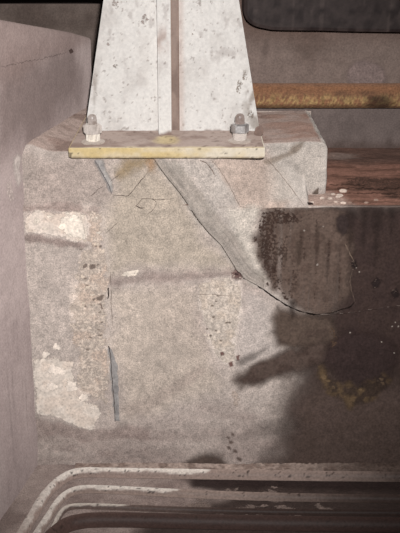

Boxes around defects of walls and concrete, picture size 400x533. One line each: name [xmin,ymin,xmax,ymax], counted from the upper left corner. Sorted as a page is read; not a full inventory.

spalling [25,207,110,430]
crack [89,160,207,231]
crack [222,247,355,315]
leakage [235,207,400,464]